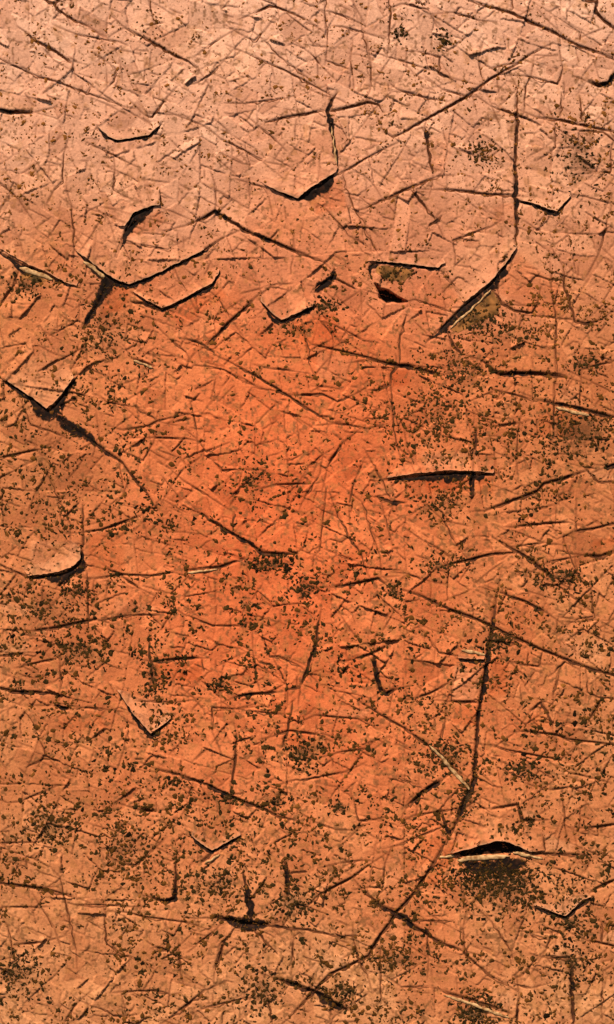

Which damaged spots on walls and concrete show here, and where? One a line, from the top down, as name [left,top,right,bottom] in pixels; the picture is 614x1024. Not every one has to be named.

peeling [251,93,382,201]
crack [250,0,614,251]
peeling [0,181,219,326]
crack [188,193,323,262]
peeling [261,267,355,324]
spalling [378,290,402,303]
peeling [432,236,517,339]
crack [173,268,614,588]
peeling [0,507,90,627]
crack [427,464,614,619]
crack [200,575,614,1024]
crack [0,859,182,954]